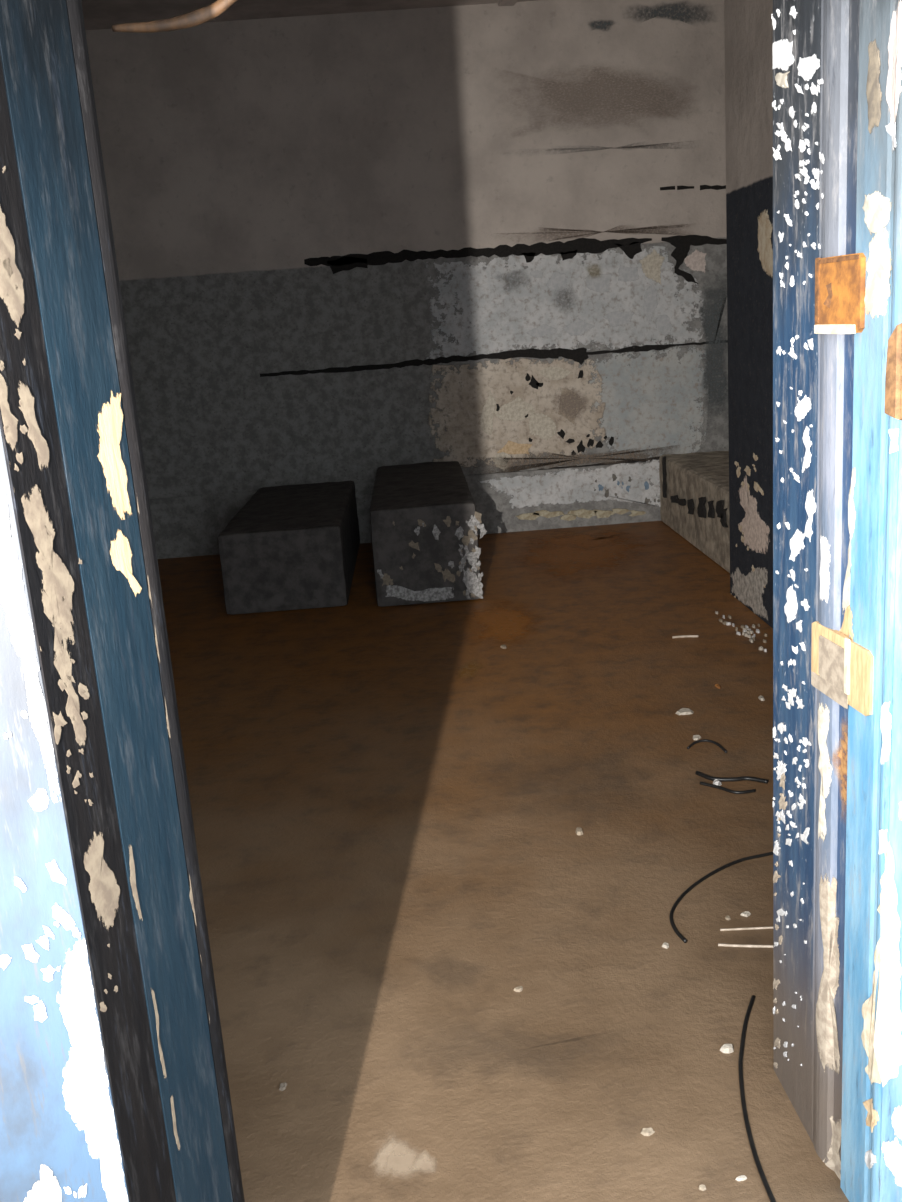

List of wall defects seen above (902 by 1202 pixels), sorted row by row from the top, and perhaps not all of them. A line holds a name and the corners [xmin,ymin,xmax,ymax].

peeling [0,208,24,339]
peeling [0,361,49,471]
peeling [97,391,153,608]
crack [260,340,728,377]
crack [304,235,727,284]
leakage [544,226,666,239]
spalling [426,245,856,667]
peeling [757,6,824,288]
peeling [0,484,94,811]
peeling [83,832,143,929]
peeling [773,703,840,1075]
peeling [861,829,902,1186]